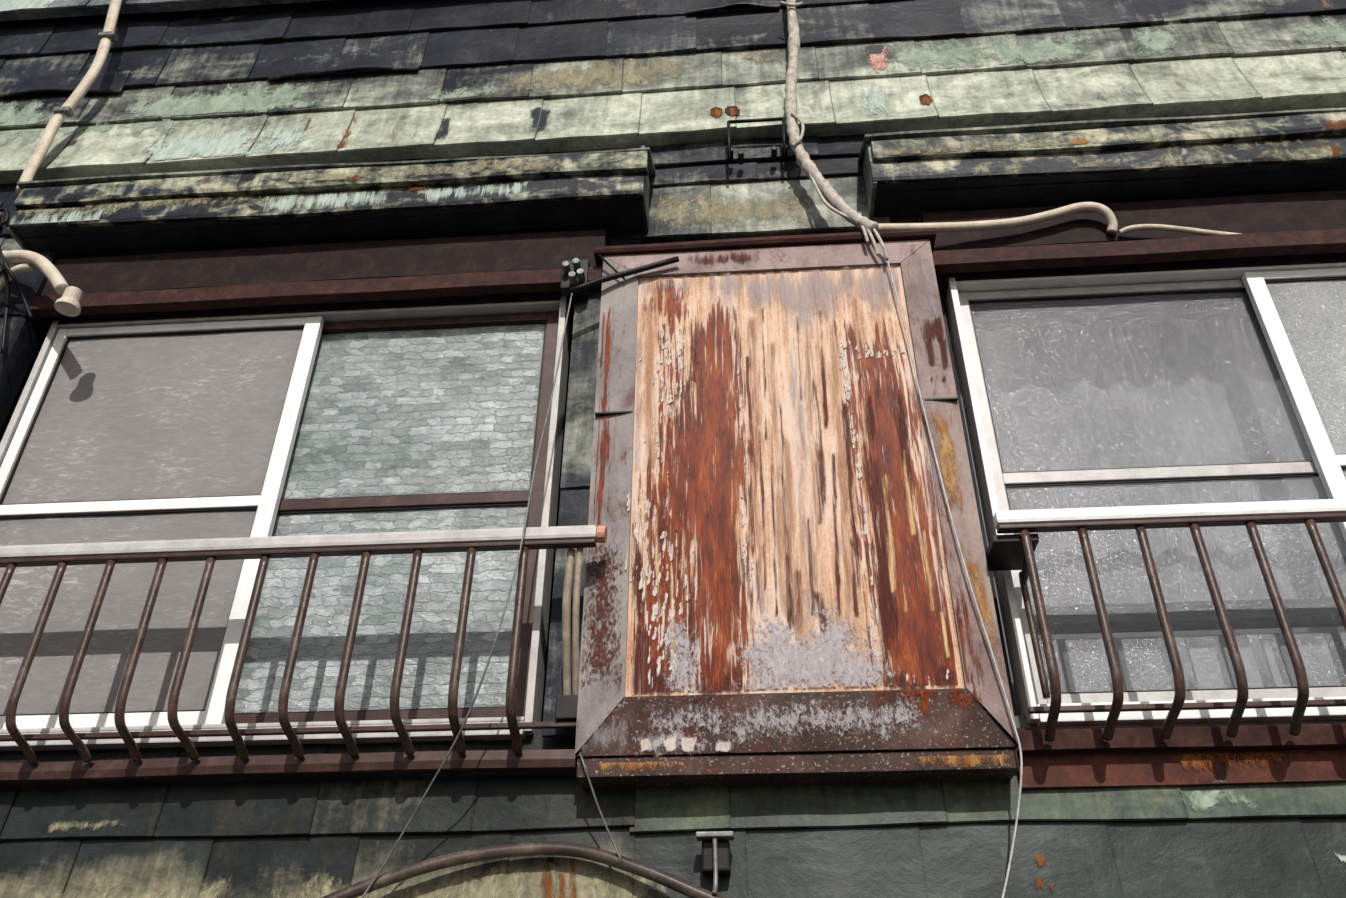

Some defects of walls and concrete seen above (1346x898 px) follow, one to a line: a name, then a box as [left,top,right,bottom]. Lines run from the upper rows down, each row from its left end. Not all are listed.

leakage [0,0,67,11]
leakage [888,34,1096,76]
leakage [1131,24,1179,55]
leakage [428,57,686,106]
leakage [0,80,317,160]
leakage [10,159,563,224]
corrosion [581,278,992,718]
peeling [625,326,949,756]
corrosion [602,761,677,770]
corrosion [920,755,1004,767]
corrosion [1180,752,1282,771]
corrosion [541,857,576,898]